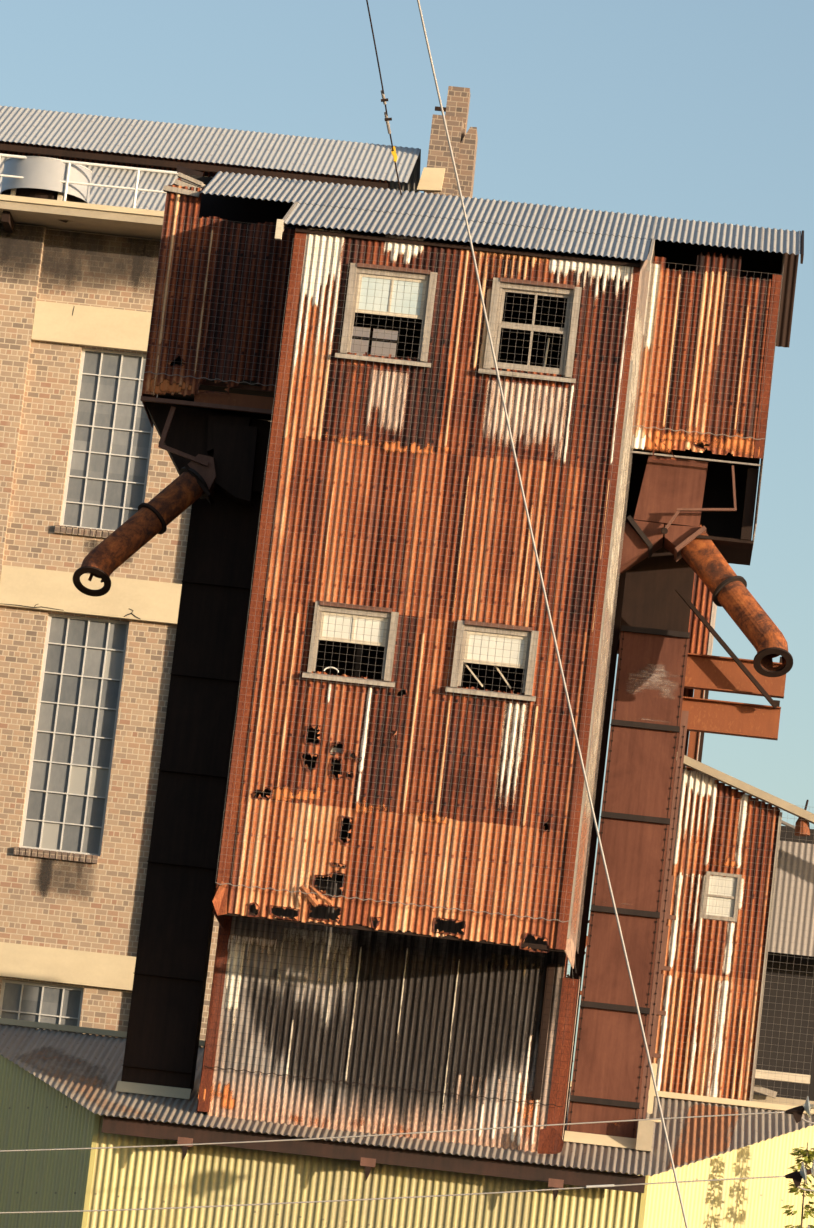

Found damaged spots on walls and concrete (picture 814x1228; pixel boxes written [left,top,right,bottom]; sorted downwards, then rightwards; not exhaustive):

corrosion [317,250,469,454]
corrosion [473,266,492,369]
water stain [563,385,574,462]
corrosion [645,271,760,457]
corrosion [248,612,320,802]
corrosion [402,634,450,824]
corrosion [523,706,538,827]
water stain [39,859,81,894]
peeling [225,864,352,1039]
water stain [268,948,538,1141]
water stain [530,1099,539,1145]
corrosion [667,977,749,1169]